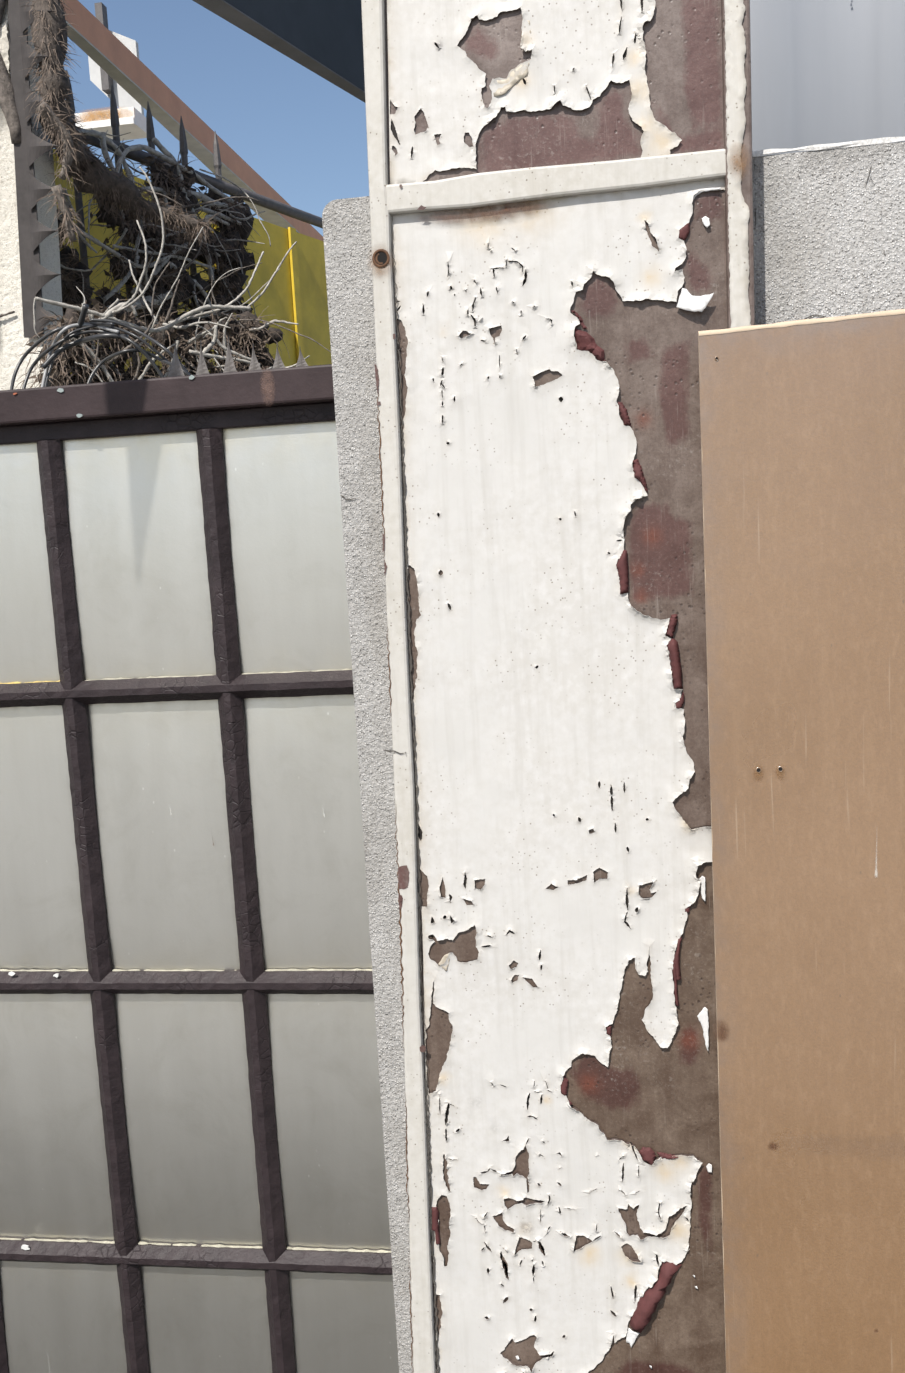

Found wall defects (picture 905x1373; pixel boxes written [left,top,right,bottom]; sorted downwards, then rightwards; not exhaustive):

peeling [424,0,724,182]
peeling [490,326,502,343]
peeling [533,369,562,387]
peeling [570,187,727,828]
peeling [420,925,514,1093]
peeling [509,950,542,987]
peeling [431,1103,451,1265]
peeling [473,1138,597,1279]
peeling [561,862,726,1373]
peeling [435,1295,443,1338]
peeling [501,1335,553,1368]